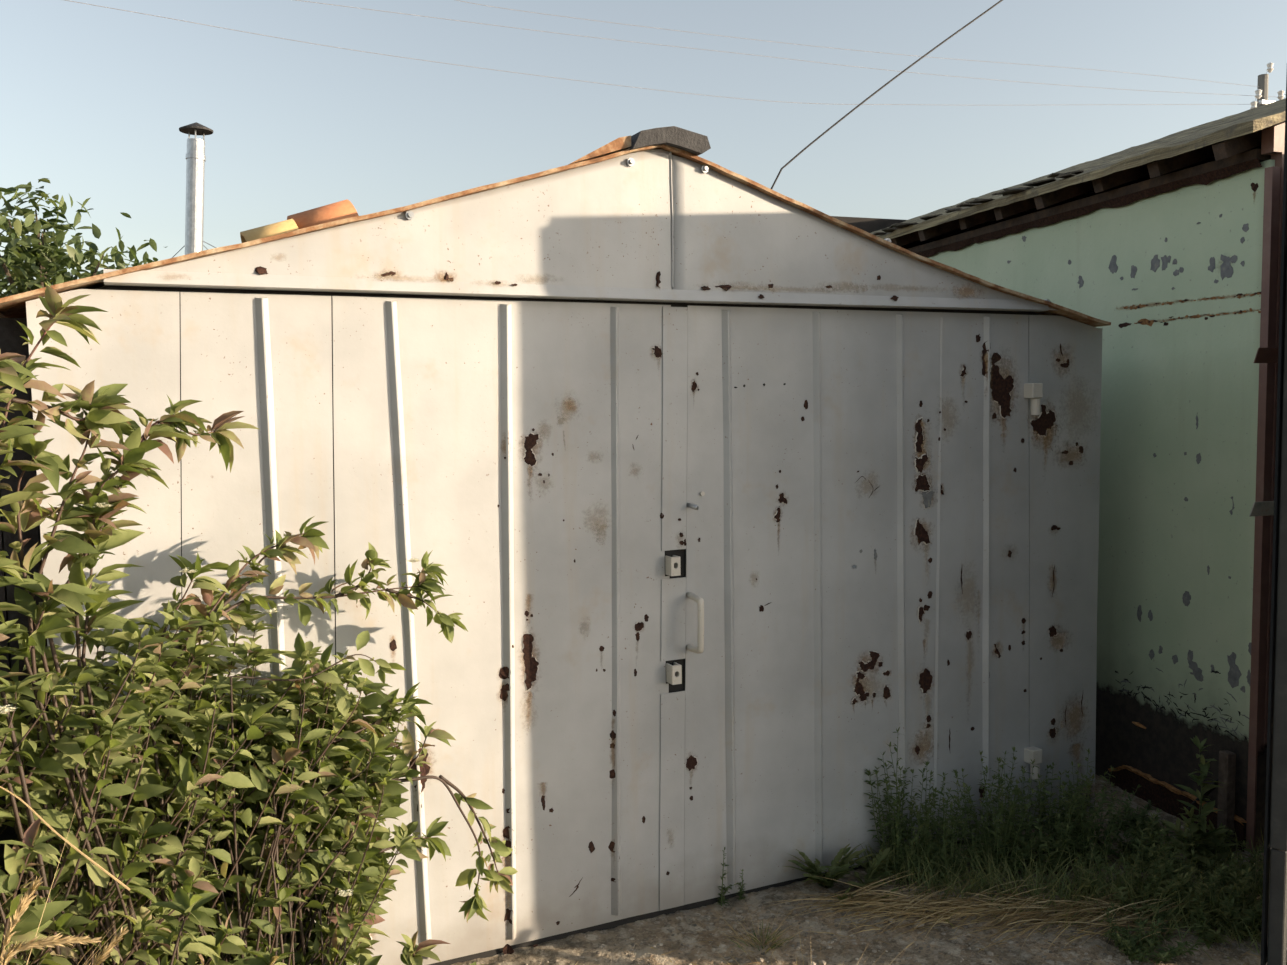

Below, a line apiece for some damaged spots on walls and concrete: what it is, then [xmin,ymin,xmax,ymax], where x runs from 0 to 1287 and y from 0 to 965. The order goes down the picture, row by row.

peeling [1108,238,1184,290]
corrosion [1118,292,1261,328]
corrosion [504,428,550,483]
corrosion [1021,404,1084,465]
corrosion [914,519,932,563]
corrosion [918,591,933,624]
corrosion [499,596,539,702]
corrosion [851,651,891,705]
peeling [1149,642,1251,693]
corrosion [686,755,698,771]
corrosion [1108,765,1218,832]